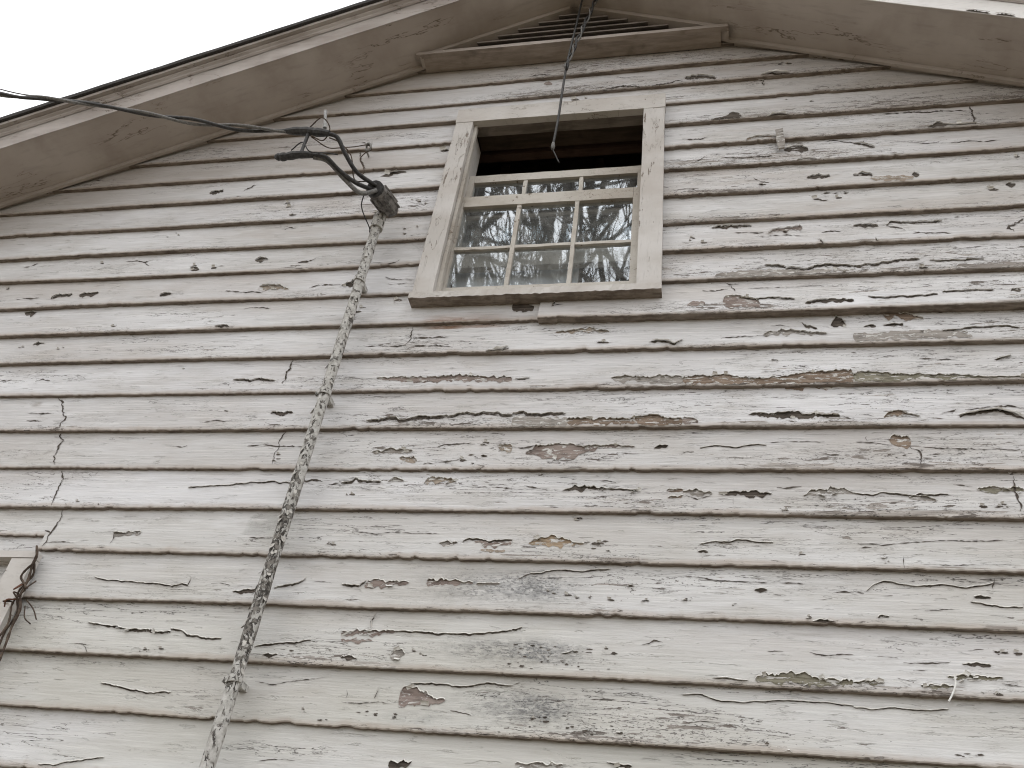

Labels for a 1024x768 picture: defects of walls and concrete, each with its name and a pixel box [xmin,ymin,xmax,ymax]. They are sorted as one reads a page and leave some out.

peeling [611,368,1024,391]
peeling [511,414,698,427]
peeling [526,442,635,460]
crack [27,379,74,546]
peeling [667,488,772,498]
crack [95,576,191,587]
crack [821,534,1023,611]
crack [171,627,222,640]
peeling [341,628,395,661]
crack [101,681,171,694]
peeling [712,670,884,688]
crack [683,693,948,723]